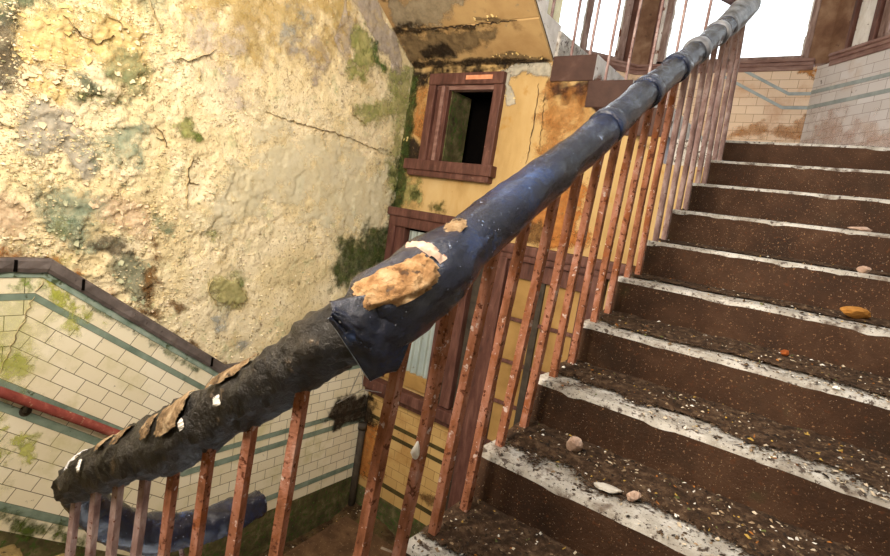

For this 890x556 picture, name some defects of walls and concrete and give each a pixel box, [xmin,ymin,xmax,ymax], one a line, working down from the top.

damp [393,26,484,35]
crack [267,106,394,155]